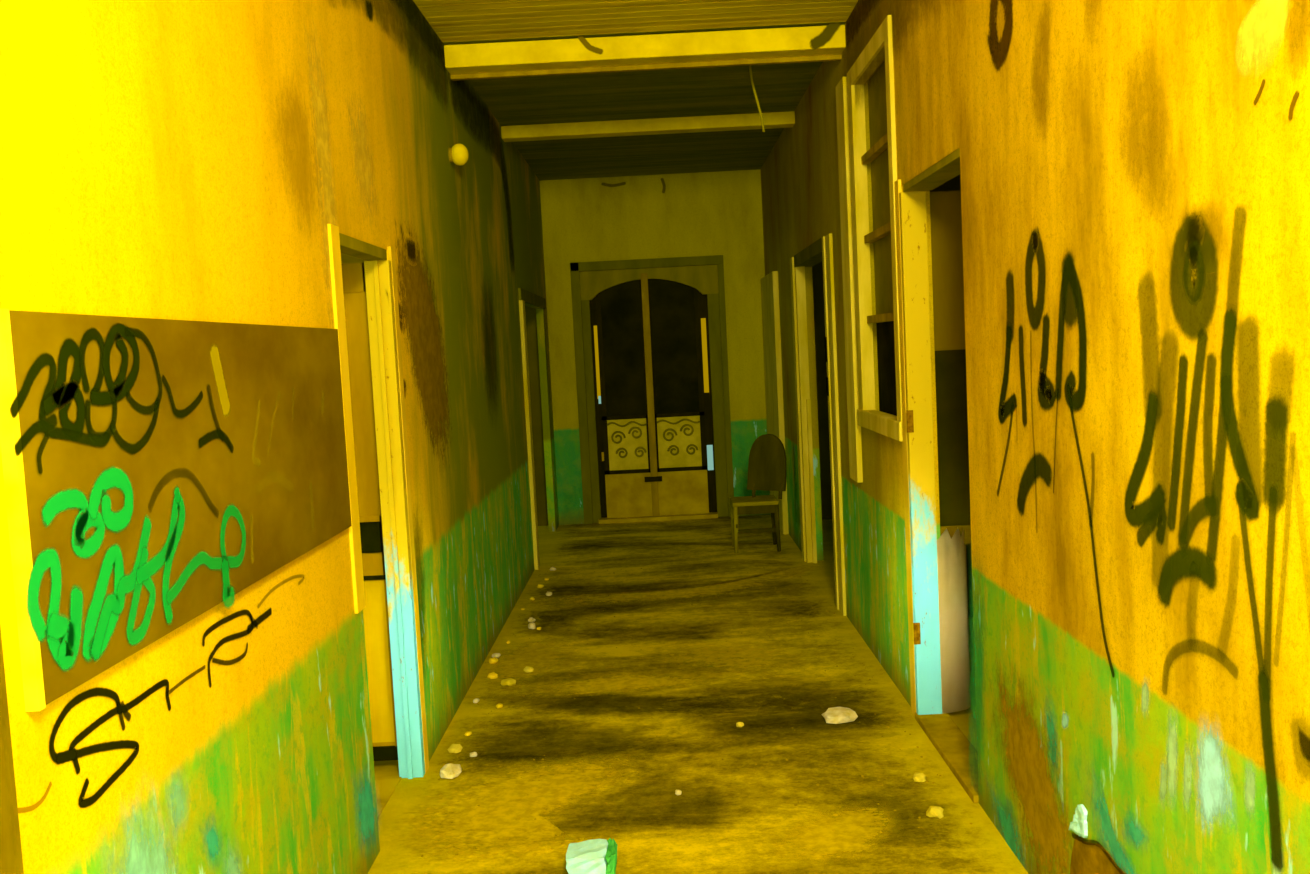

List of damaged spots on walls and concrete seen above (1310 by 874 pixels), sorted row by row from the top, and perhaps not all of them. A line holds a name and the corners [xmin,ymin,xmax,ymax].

damp [366,0,514,264]
damp [473,680,873,760]
peeling [971,596,1144,874]
peeling [1160,722,1255,825]